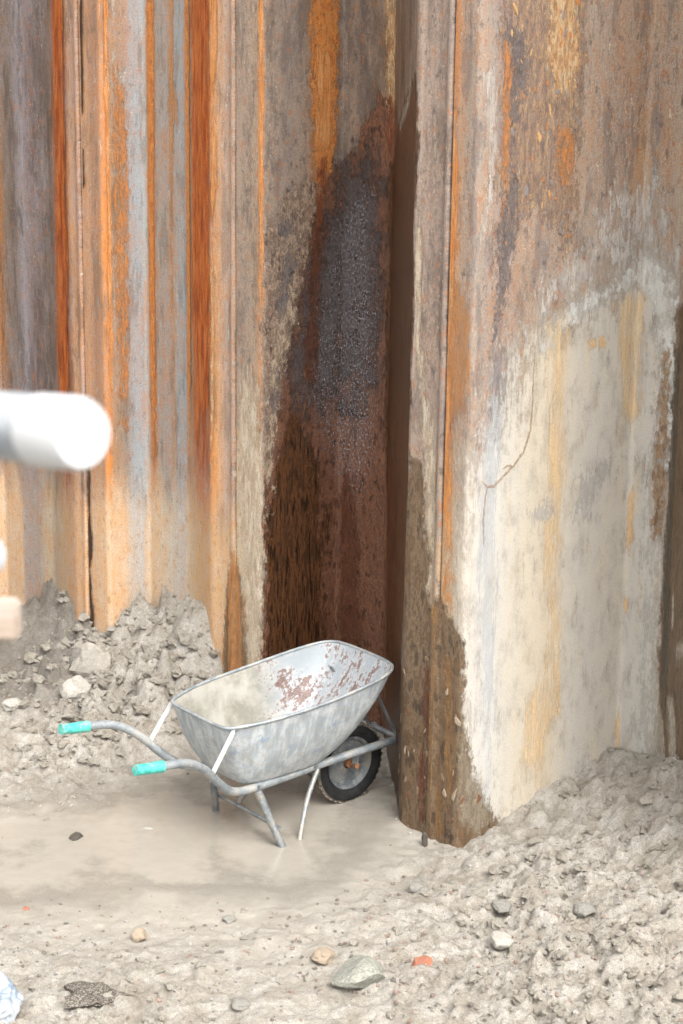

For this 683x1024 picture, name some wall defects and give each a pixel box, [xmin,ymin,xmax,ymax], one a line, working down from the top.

rust [52,0,69,395]
rust [147,0,156,457]
rust [168,0,217,481]
rust [258,0,341,524]
rust [441,102,472,610]
damp [238,72,683,839]
crack [483,366,535,544]
peeling [441,770,481,808]